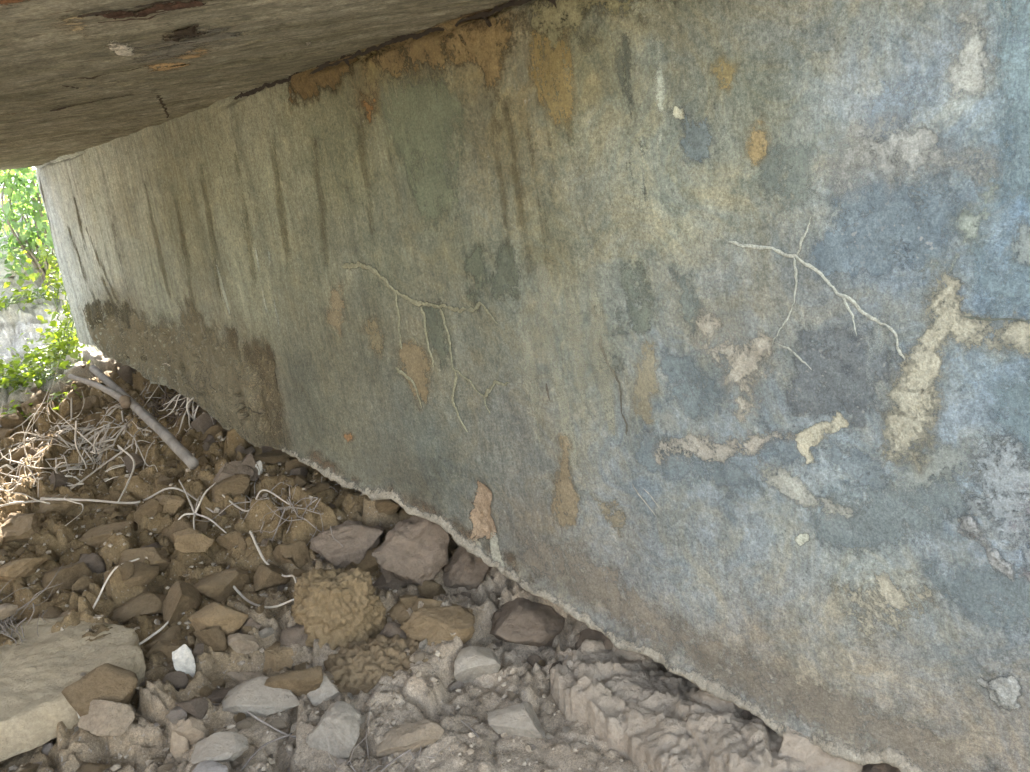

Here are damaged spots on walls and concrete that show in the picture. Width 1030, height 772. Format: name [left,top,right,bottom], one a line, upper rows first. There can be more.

rust [77,0,221,23]
leakage [68,198,285,449]
crack [341,261,510,432]
peeling [691,309,772,422]
peeling [654,412,853,519]
crack [729,217,905,370]
peeling [882,254,1030,582]
spalling [282,447,934,772]
peeling [976,676,1022,711]